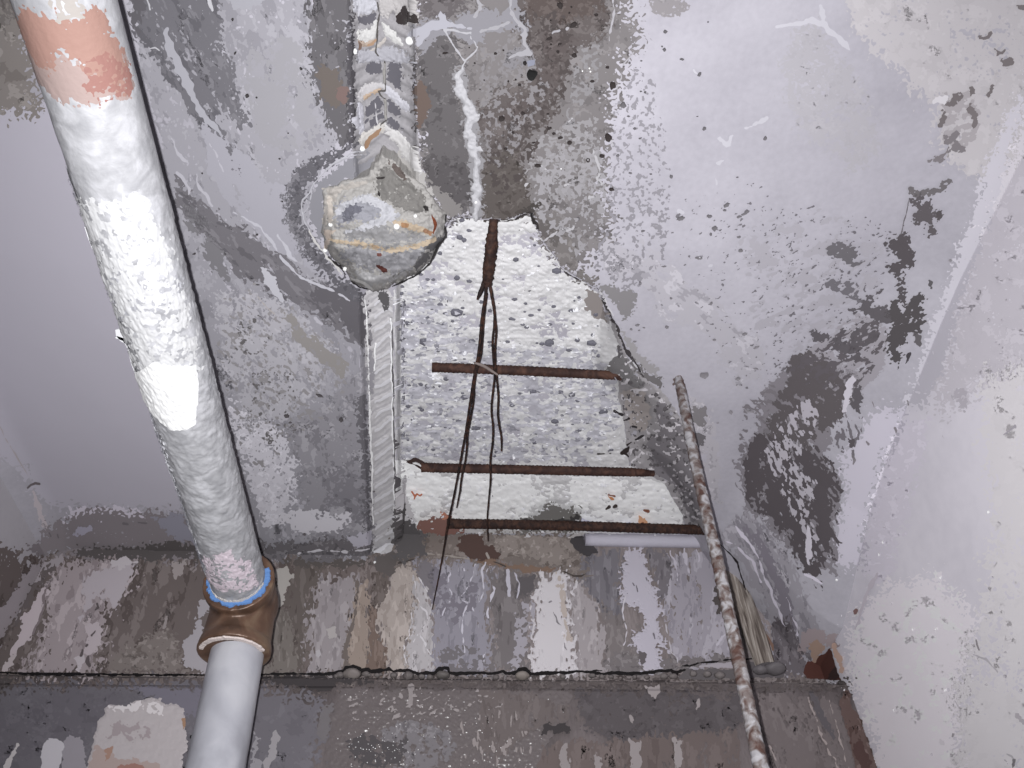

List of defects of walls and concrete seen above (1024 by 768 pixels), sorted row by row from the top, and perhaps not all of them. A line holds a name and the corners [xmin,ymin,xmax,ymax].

crack [0,670,205,678]
water stain [126,0,767,768]
crack [261,658,752,676]
spalling [391,216,770,768]
rust [797,628,844,680]
water stain [718,0,1024,768]